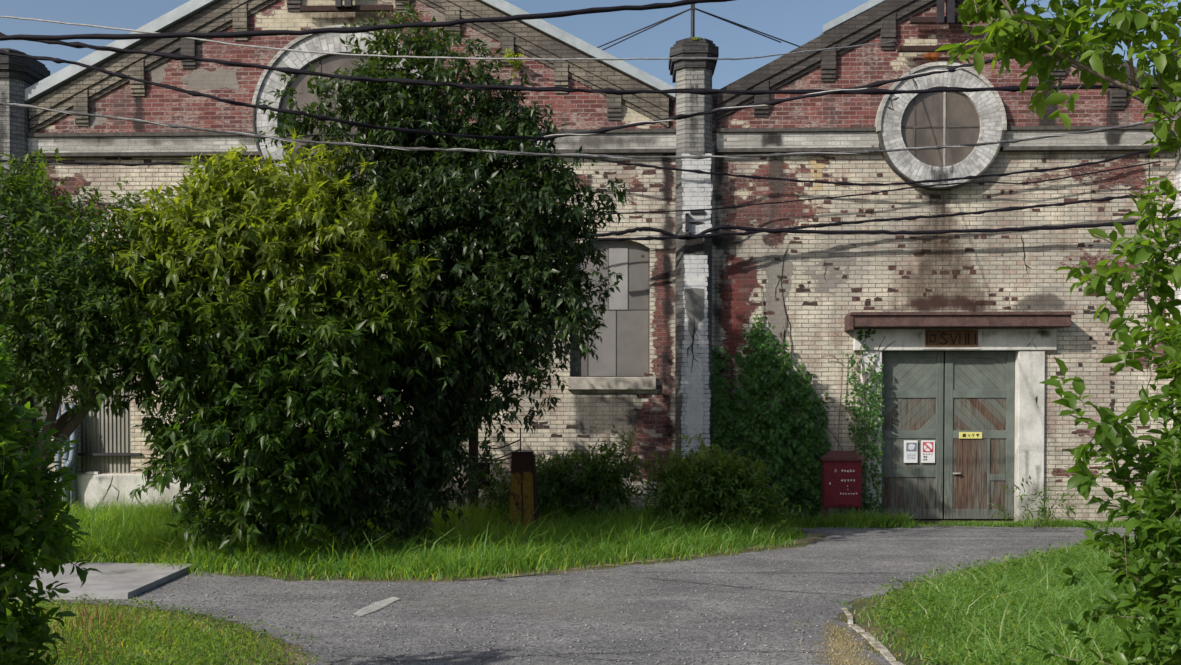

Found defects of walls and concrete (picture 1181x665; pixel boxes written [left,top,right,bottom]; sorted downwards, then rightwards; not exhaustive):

water stain [907,283,984,312]
water stain [1013,295,1062,311]
peeling [571,153,874,484]
spalling [531,421,590,438]